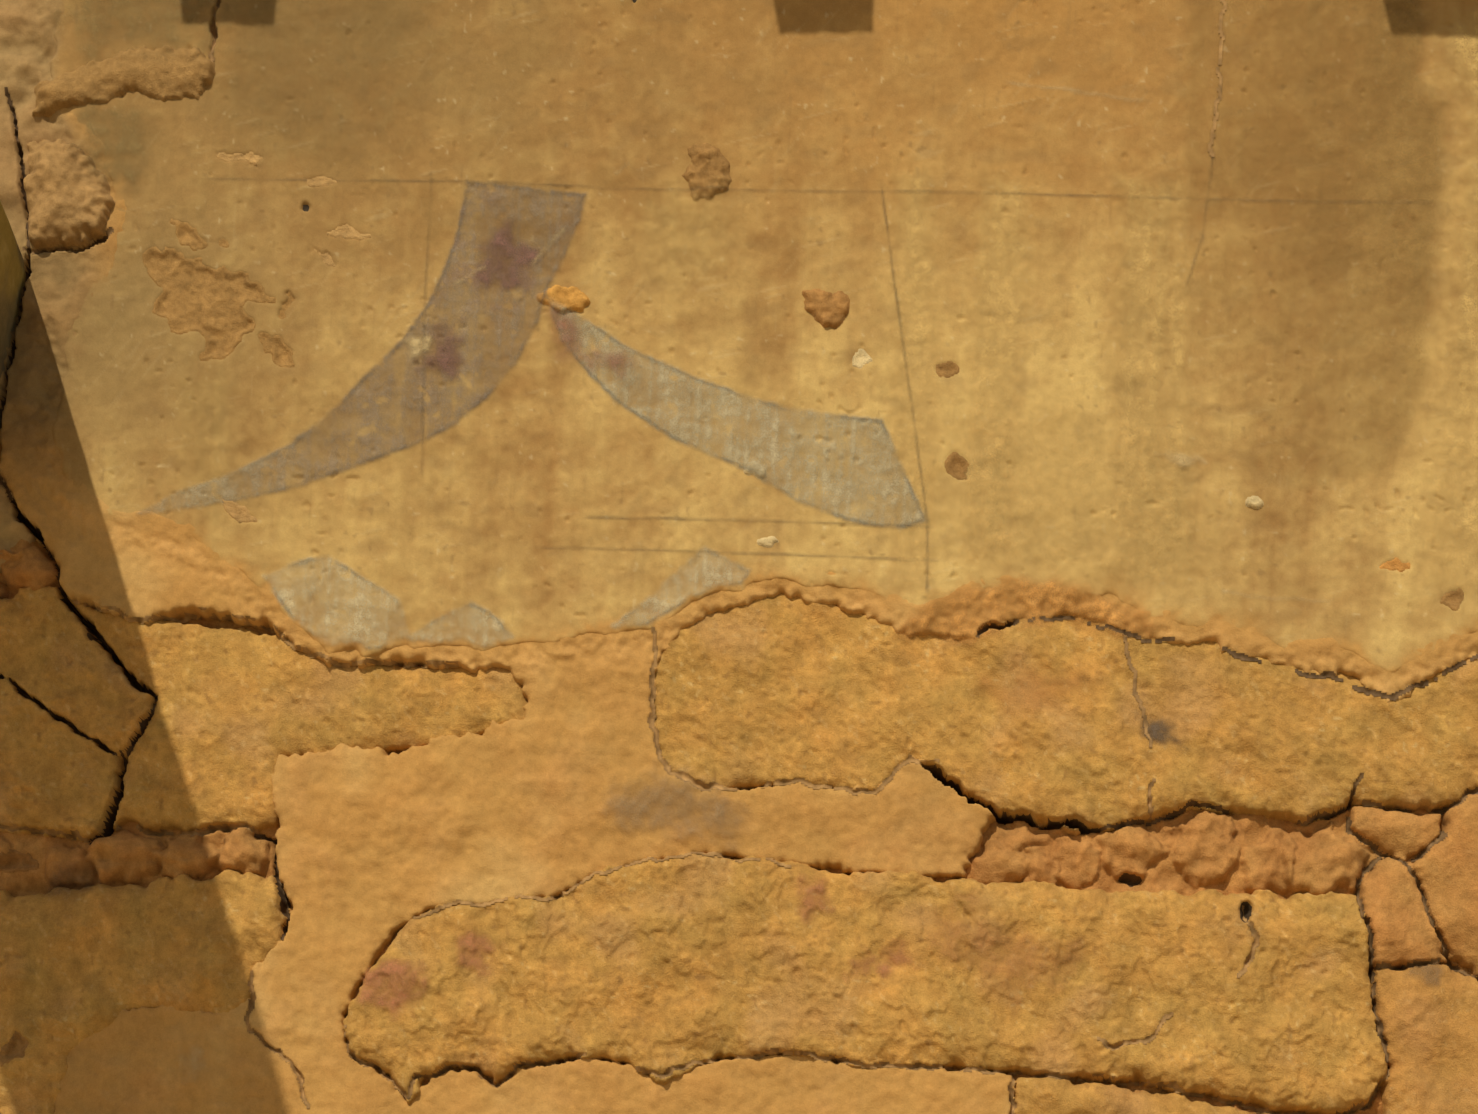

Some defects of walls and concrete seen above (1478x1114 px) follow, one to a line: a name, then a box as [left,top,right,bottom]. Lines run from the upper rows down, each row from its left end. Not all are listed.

crack [208,0,221,66]
crack [0,87,114,429]
spalling [1440,587,1464,611]
crack [0,474,459,940]
crack [647,615,1230,835]
crack [1222,647,1478,701]
crack [635,773,1478,1114]
crack [244,970,310,1109]
crack [344,1024,586,1100]